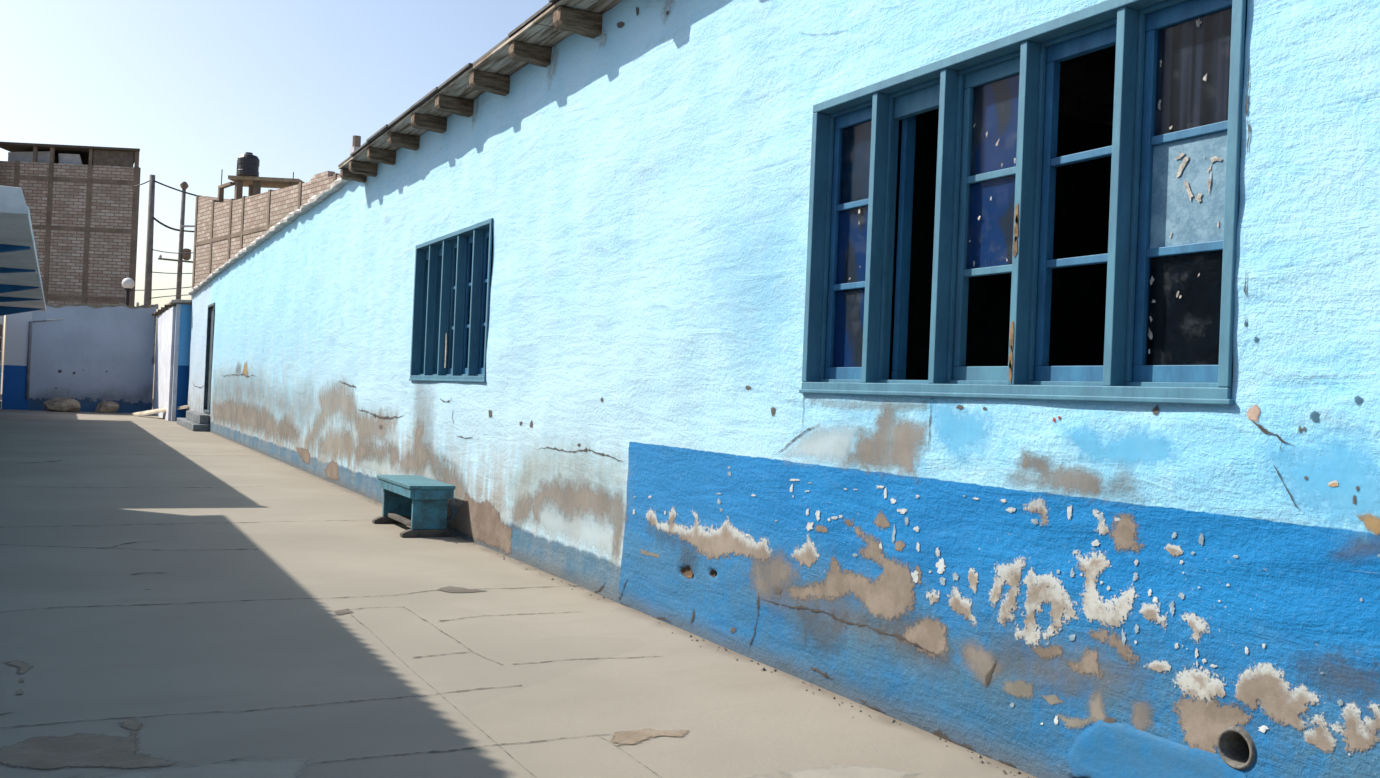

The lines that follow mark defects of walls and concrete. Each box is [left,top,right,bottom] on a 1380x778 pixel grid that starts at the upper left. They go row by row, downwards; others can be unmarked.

crack [538,447,626,461]
damp [513,481,626,554]
peeling [633,493,771,579]
peeling [774,485,1380,756]
spalling [0,719,177,769]